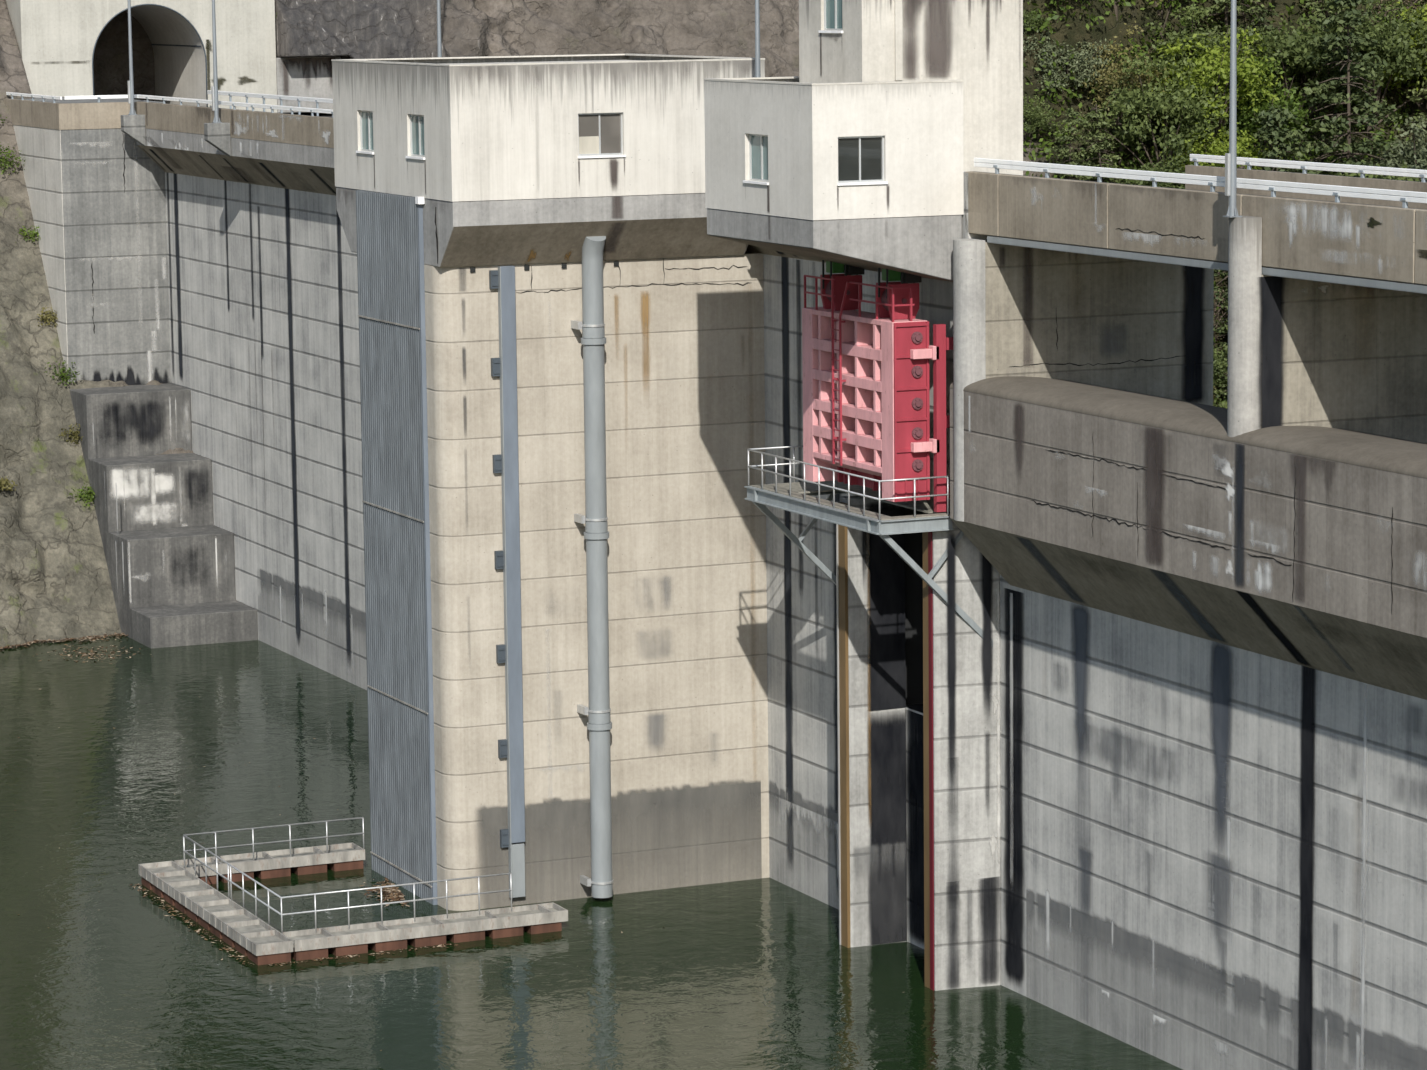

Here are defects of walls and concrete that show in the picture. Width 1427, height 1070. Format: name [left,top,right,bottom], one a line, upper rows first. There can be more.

water stain [890,0,950,78]
water stain [93,116,366,660]
crack [516,258,749,293]
water stain [776,251,801,483]
crack [1117,228,1204,240]
water stain [479,799,591,901]
water stain [611,510,839,889]
water stain [947,533,956,771]
water stain [949,871,959,987]
water stain [981,427,1427,1070]